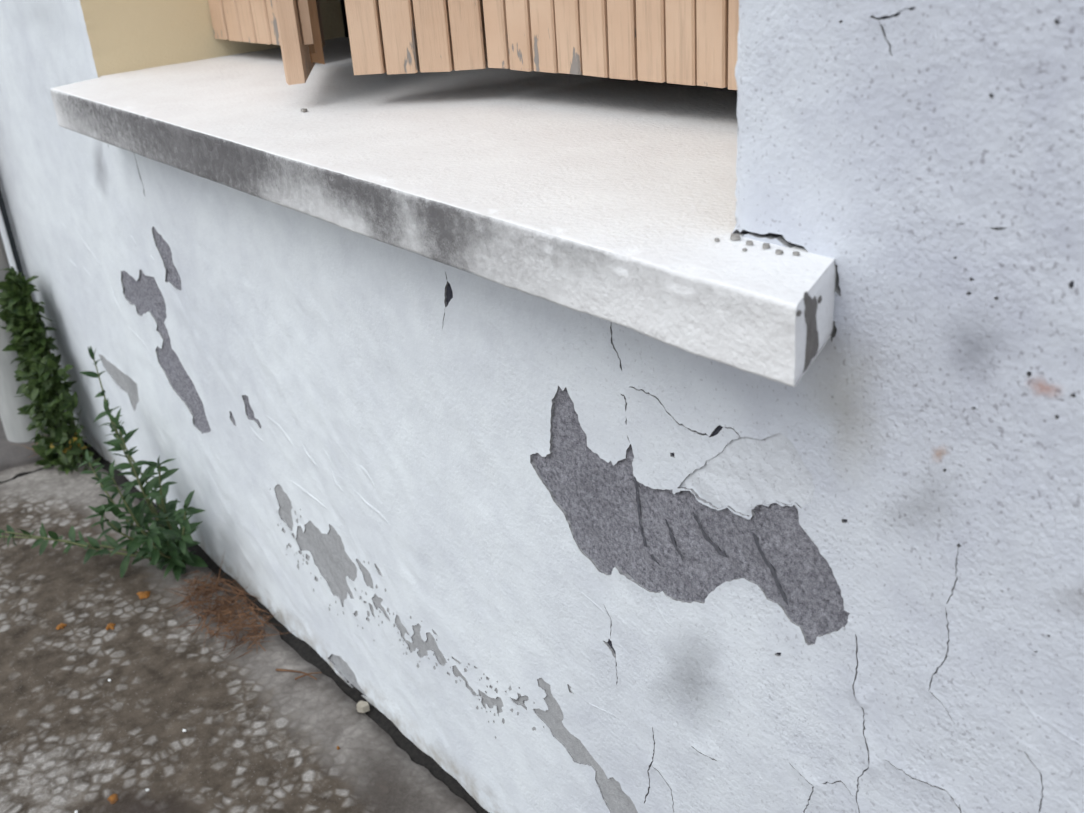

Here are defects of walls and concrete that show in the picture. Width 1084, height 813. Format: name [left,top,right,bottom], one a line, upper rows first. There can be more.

peeling [99,354,139,411]
spalling [121,227,211,434]
crack [610,326,740,443]
spalling [797,292,822,373]
spalling [530,386,850,645]
peeling [270,484,638,813]